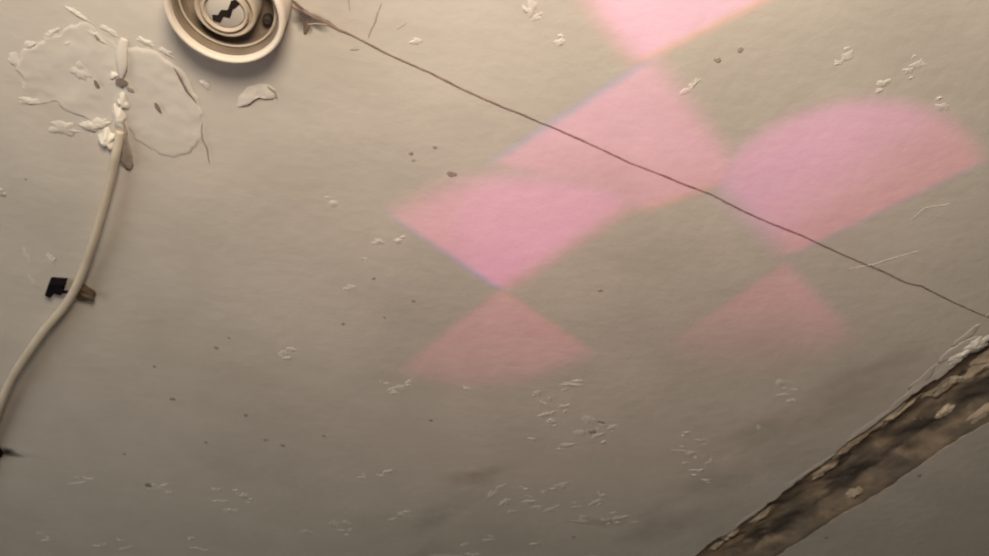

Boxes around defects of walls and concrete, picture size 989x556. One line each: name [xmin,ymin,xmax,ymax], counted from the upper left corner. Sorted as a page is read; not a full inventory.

flaking render [7,6,210,170]
crack [291,0,989,318]
flaking render [696,335,989,556]